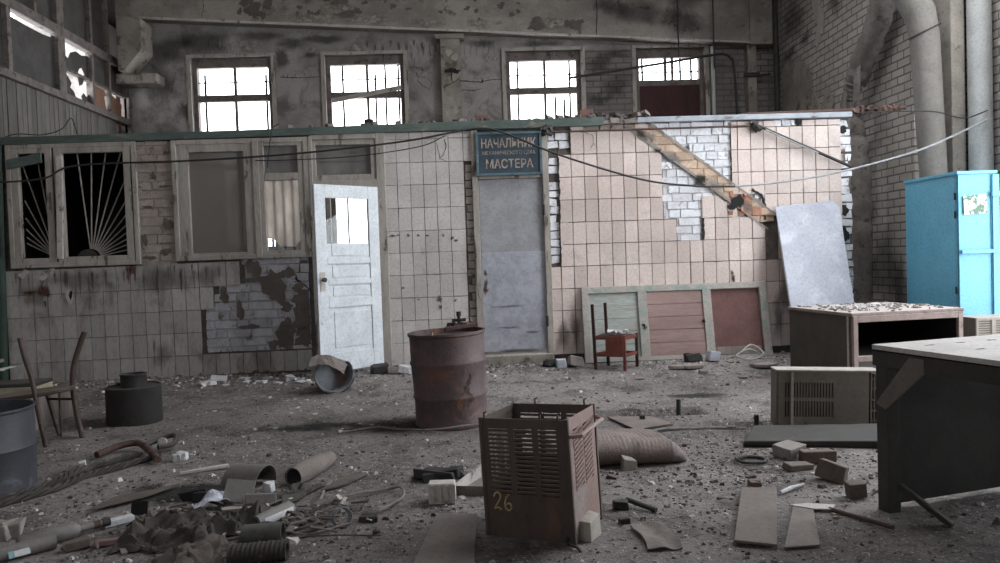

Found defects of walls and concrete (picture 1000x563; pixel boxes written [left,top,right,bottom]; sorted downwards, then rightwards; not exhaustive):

spalling [528,16,584,31]
spalling [548,129,571,264]
spalling [583,121,776,241]
corrosion [20,277,50,307]
spalling [206,257,313,353]